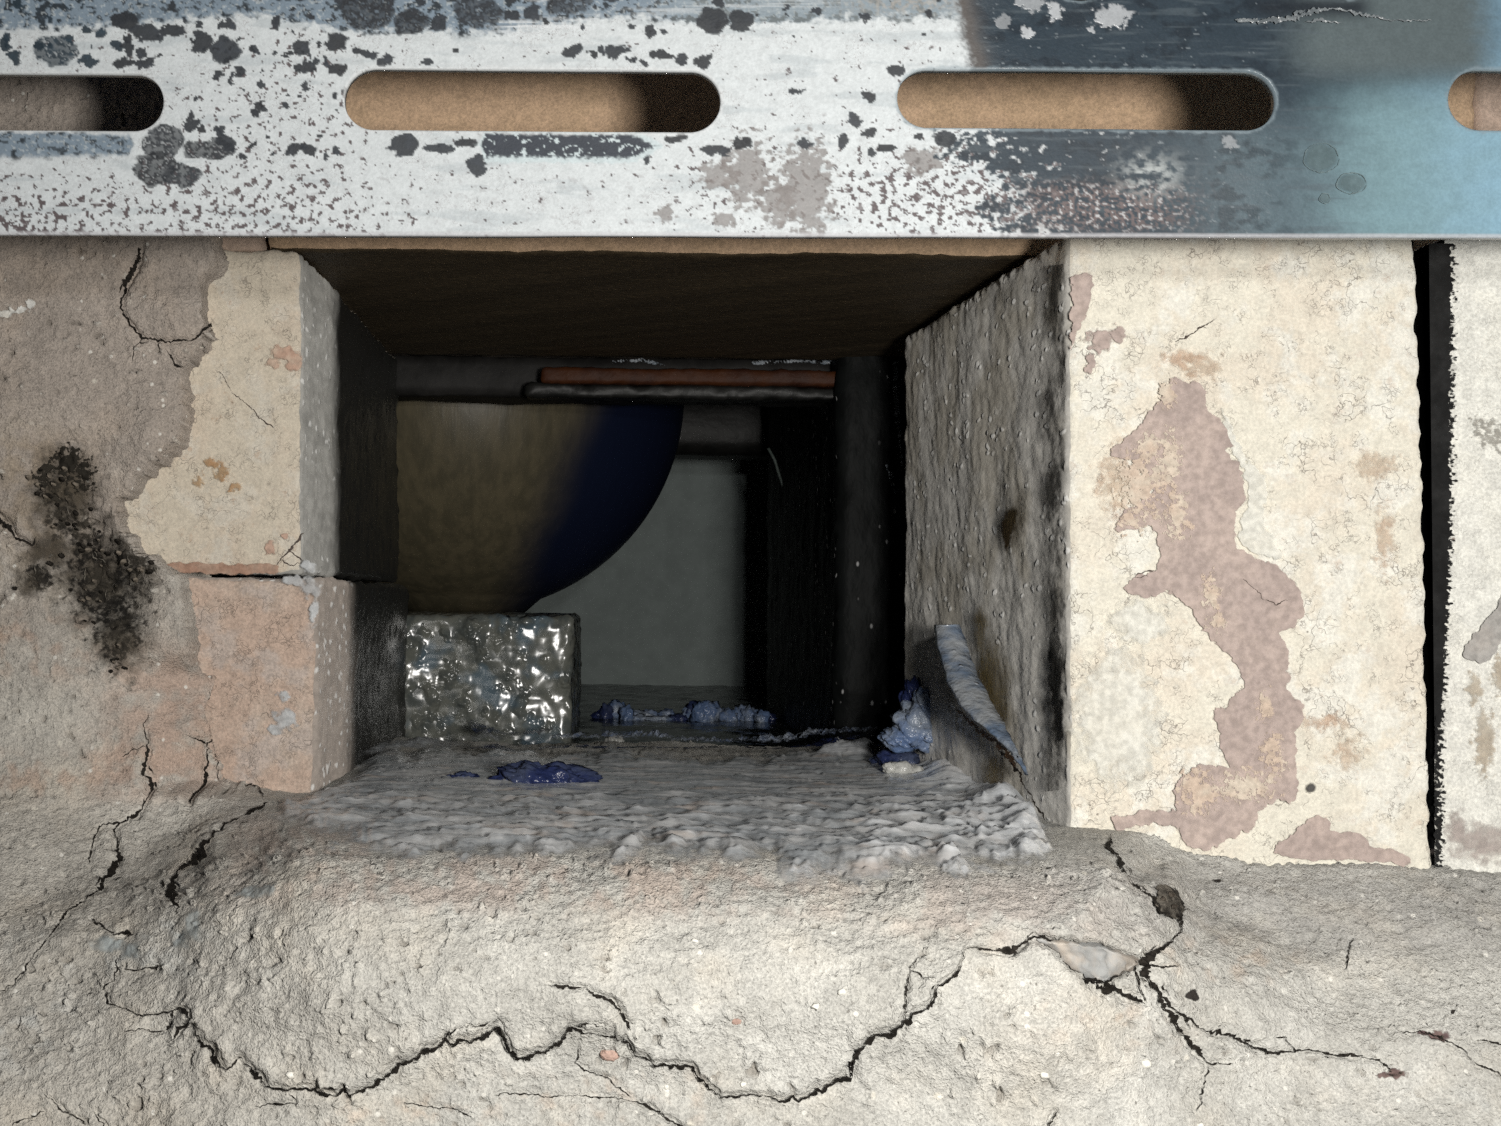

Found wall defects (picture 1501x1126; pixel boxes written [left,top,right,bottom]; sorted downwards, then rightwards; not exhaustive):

crack [119,248,213,368]
peeling [266,345,302,371]
crack [0,518,36,546]
peeling [1111,377,1305,851]
peeling [1274,815,1411,867]
crack [1,715,1055,1126]
crack [1084,834,1501,1110]